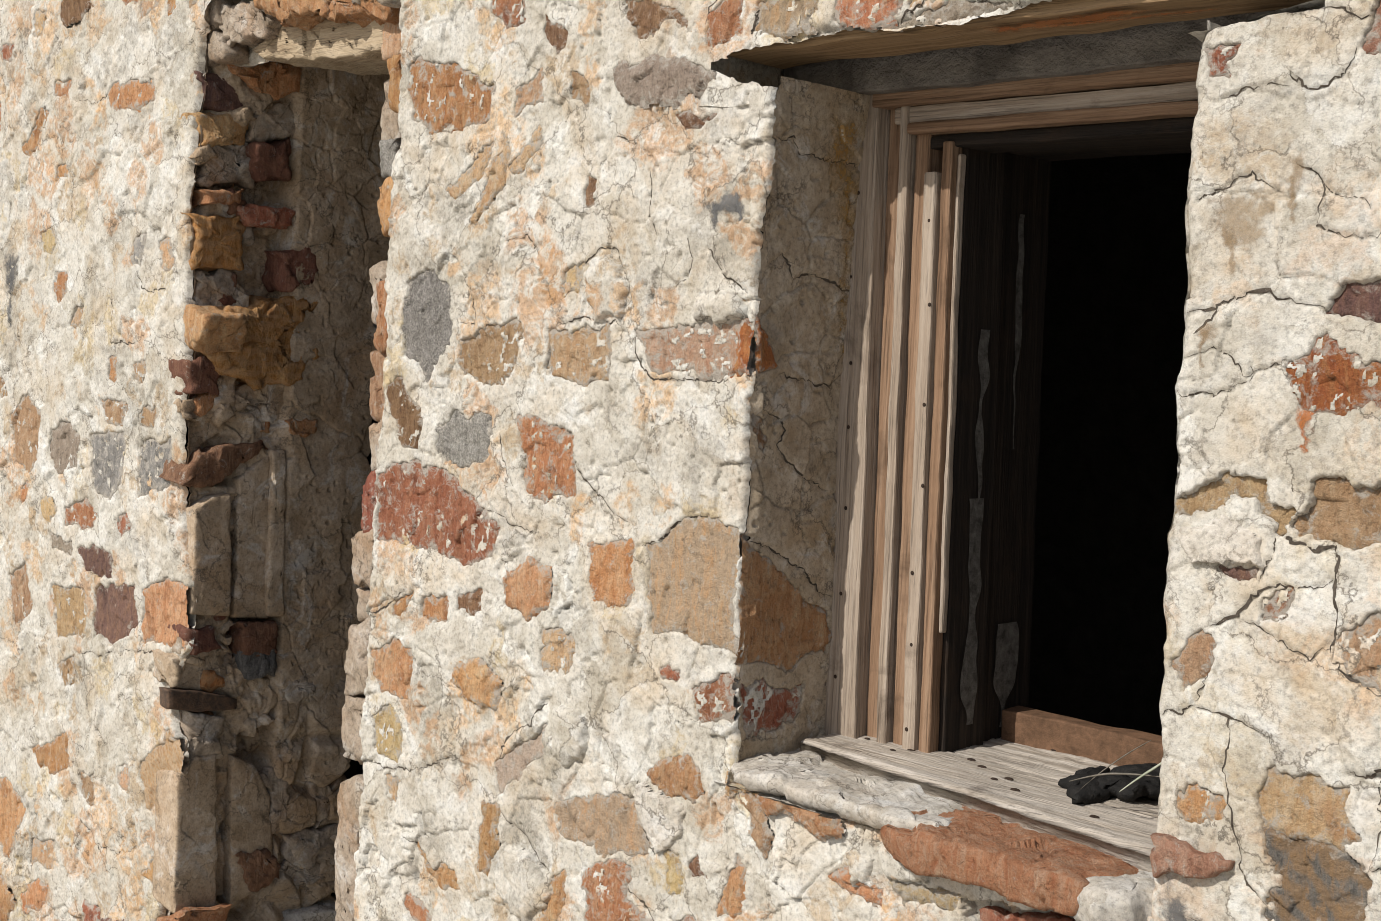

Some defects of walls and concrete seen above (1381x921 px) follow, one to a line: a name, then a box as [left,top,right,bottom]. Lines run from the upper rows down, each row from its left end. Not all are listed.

crack [1225,6,1369,98]
crack [617,136,746,291]
crack [782,135,856,168]
crack [1199,166,1381,238]
crack [557,247,728,383]
crack [773,253,849,292]
crack [1178,288,1324,397]
crack [1163,535,1381,907]